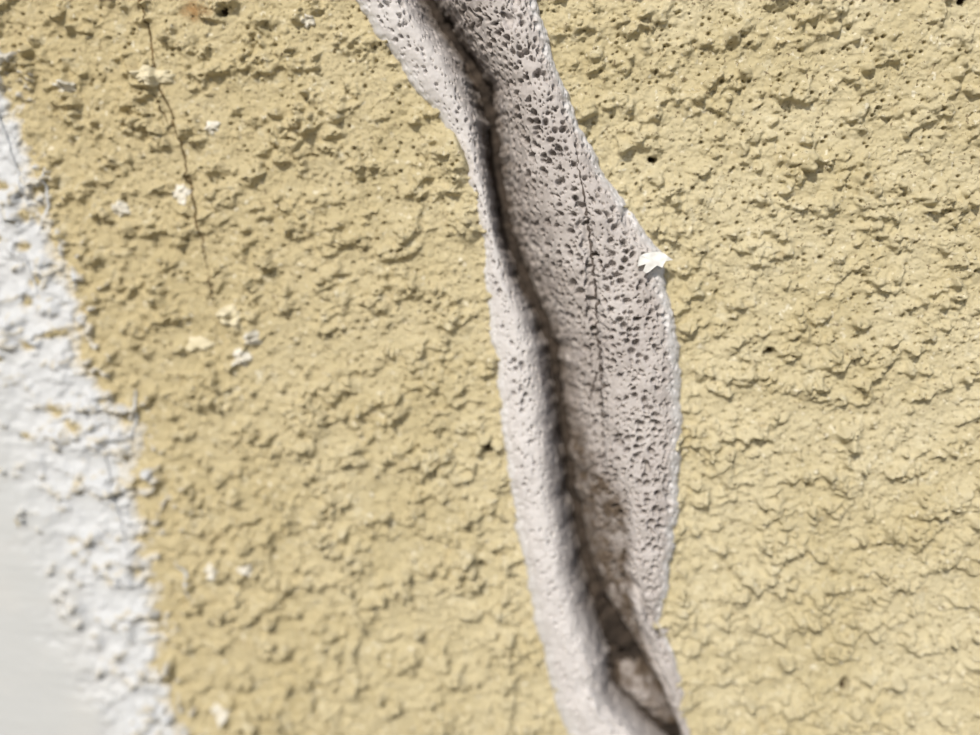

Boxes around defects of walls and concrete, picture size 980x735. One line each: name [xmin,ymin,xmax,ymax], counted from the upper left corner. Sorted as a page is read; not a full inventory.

crack [424,0,681,735]